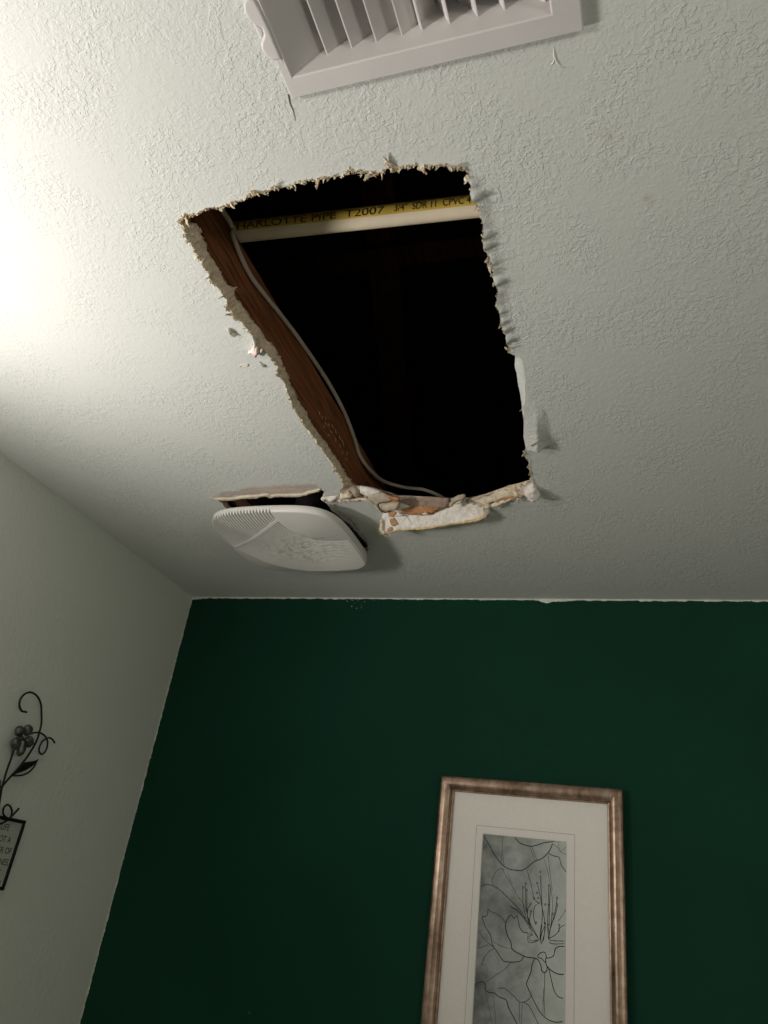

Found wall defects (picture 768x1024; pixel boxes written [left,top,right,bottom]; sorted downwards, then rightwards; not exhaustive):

spalling [176,156,519,513]
spalling [498,435,538,500]